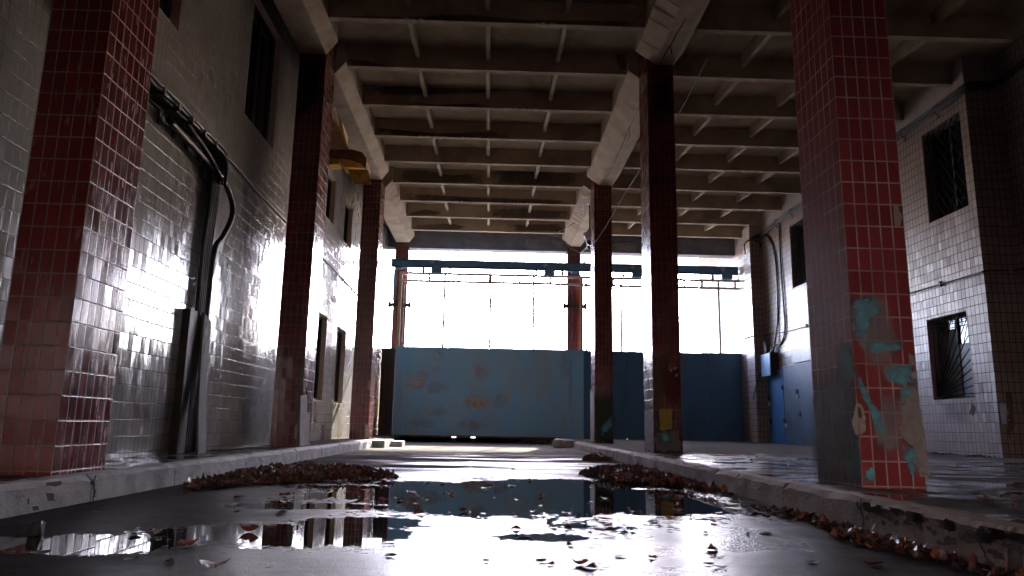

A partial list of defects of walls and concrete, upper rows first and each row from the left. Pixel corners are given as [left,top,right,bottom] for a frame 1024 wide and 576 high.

spalling [852,403,866,435]